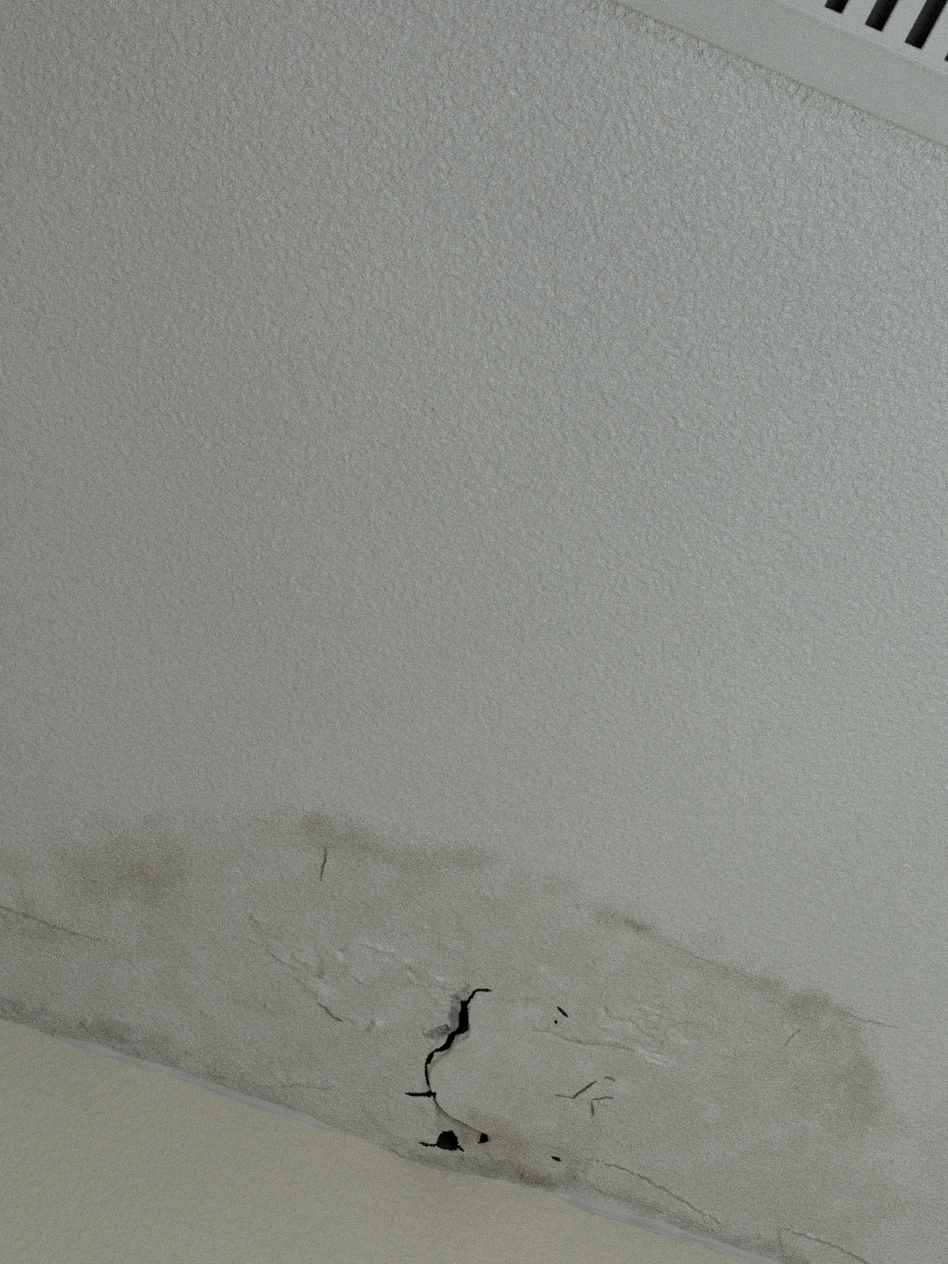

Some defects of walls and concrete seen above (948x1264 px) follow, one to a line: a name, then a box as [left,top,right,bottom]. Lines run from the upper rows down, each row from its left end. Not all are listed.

spalling [422,986,472,1055]
crack [405,988,492,1128]
spalling [436,1104,488,1144]